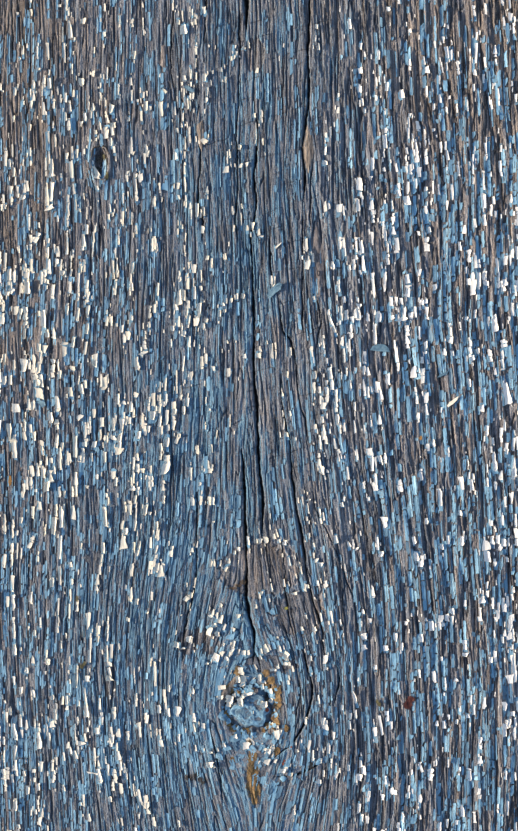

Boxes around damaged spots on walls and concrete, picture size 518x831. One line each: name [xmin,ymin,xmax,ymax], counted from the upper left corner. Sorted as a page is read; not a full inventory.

peeling [130,0,250,245]
peeling [420,24,500,115]
peeling [307,113,518,485]
peeling [0,0,218,831]
peeling [209,490,328,600]
crack [234,0,340,753]
peeling [354,448,387,501]
peeling [479,416,518,567]
peeling [195,603,366,788]
peeling [435,692,518,740]
peeling [478,580,518,684]
peeling [357,776,422,831]